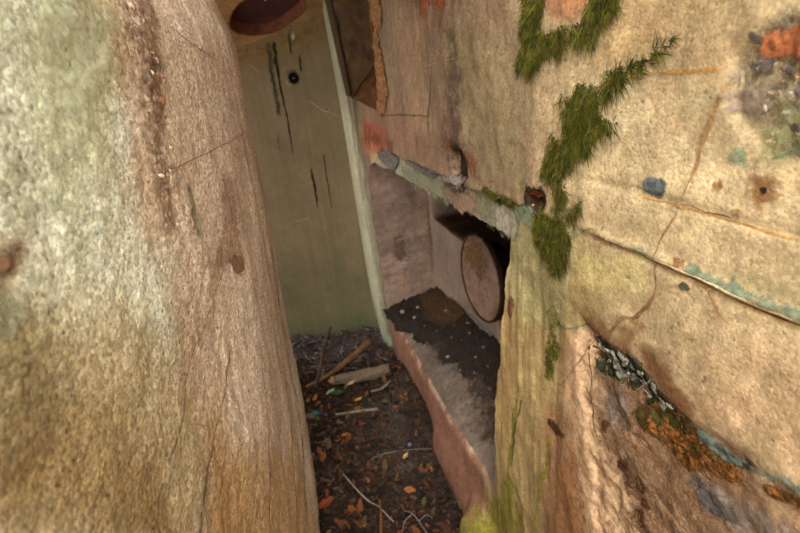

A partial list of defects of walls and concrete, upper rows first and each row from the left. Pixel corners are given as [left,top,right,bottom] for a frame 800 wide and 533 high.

rust [746,175,776,213]
crack [641,196,799,240]
spalling [596,341,720,533]